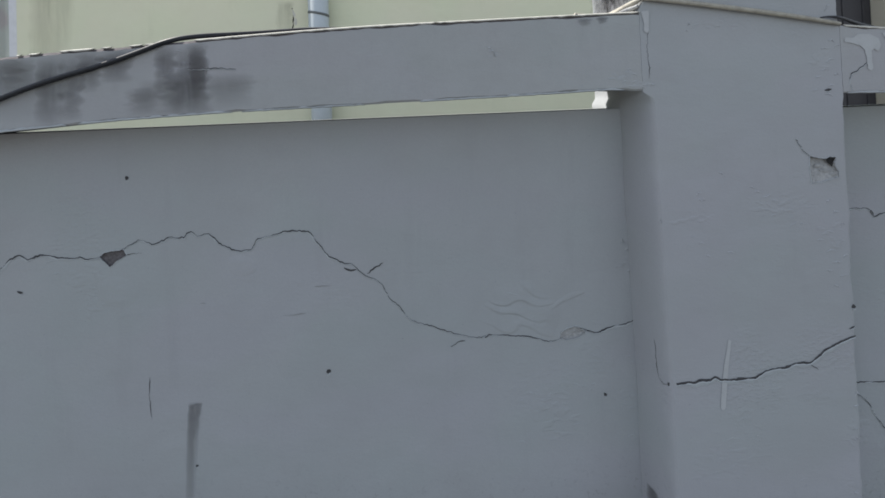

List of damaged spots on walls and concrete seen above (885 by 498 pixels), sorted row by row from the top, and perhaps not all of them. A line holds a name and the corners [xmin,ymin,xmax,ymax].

spalling [809,156,839,184]
crack [849,208,885,218]
crack [0,254,101,273]
spalling [99,249,127,268]
crack [124,230,561,347]
crack [581,320,633,334]
crack [654,335,856,388]
crack [857,381,885,430]